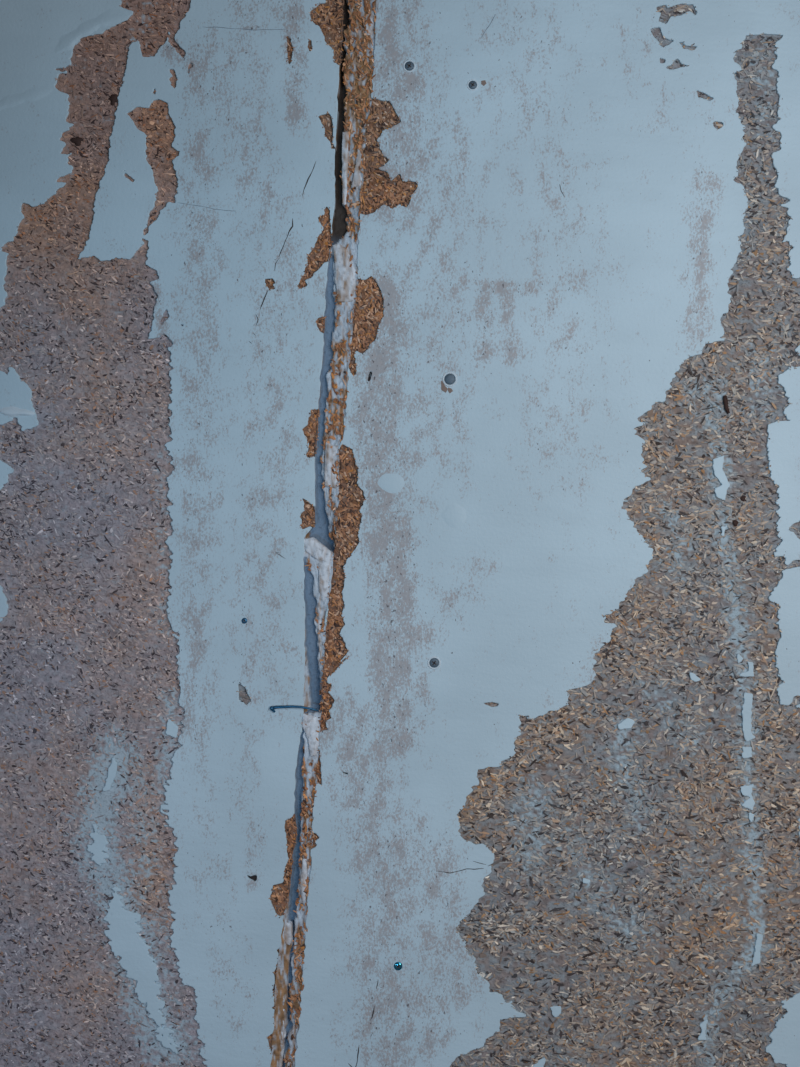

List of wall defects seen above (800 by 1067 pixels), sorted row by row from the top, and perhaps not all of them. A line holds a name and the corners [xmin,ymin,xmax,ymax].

spalling [319,111,335,149]
spalling [359,97,418,215]
spalling [297,207,333,289]
spalling [316,316,327,333]
spalling [347,276,384,381]
spalling [302,409,320,458]
peeling [0,0,207,1067]
spalling [300,499,316,529]
crack [270,0,376,1067]
spalling [318,444,366,732]
peeling [450,32,800,1067]
spalling [314,750,322,786]